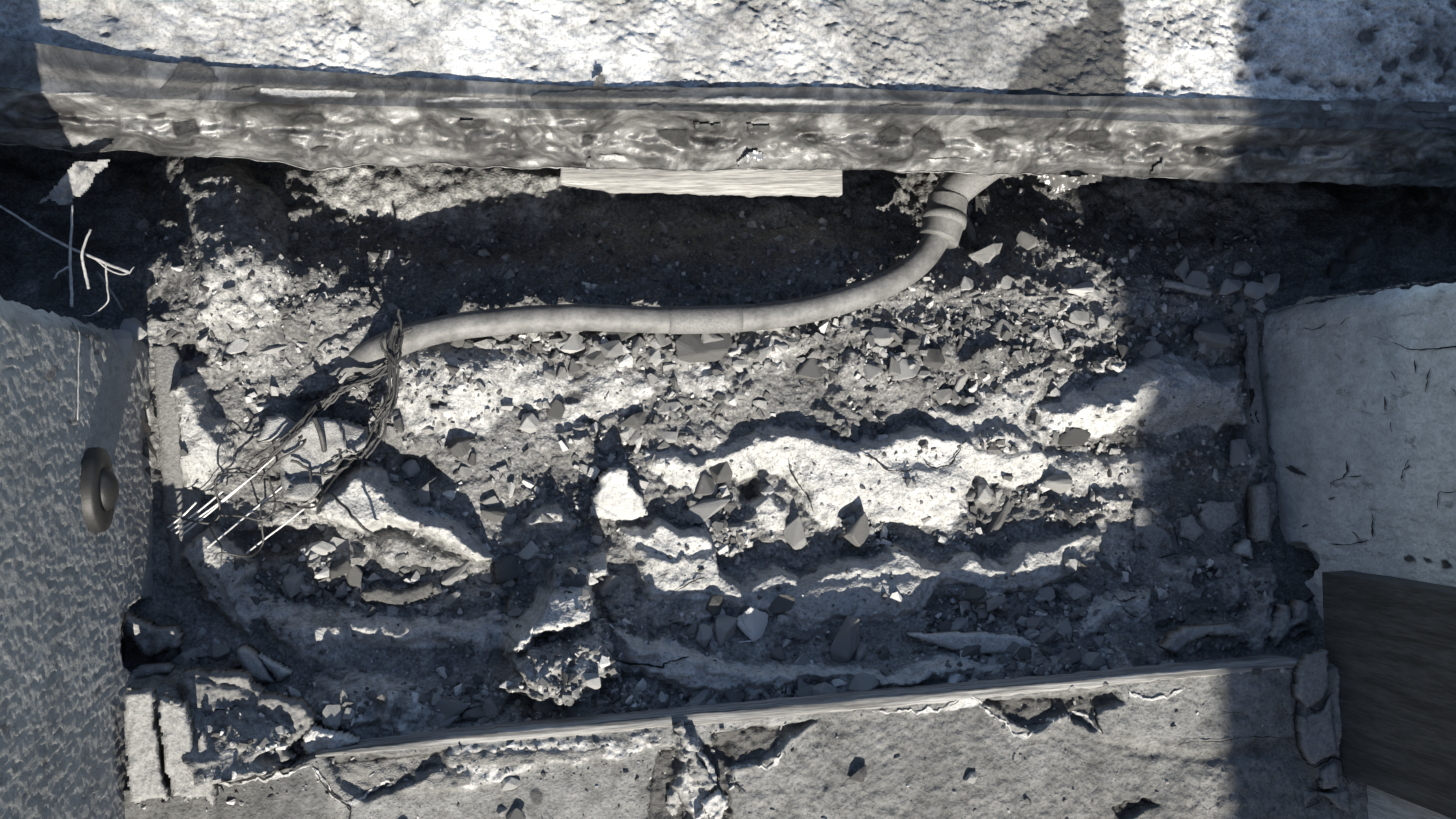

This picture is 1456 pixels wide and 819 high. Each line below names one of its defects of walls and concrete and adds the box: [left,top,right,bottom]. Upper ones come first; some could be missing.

spalling [1230,539,1253,559]
spalling [121,608,186,657]
peeling [123,687,606,806]